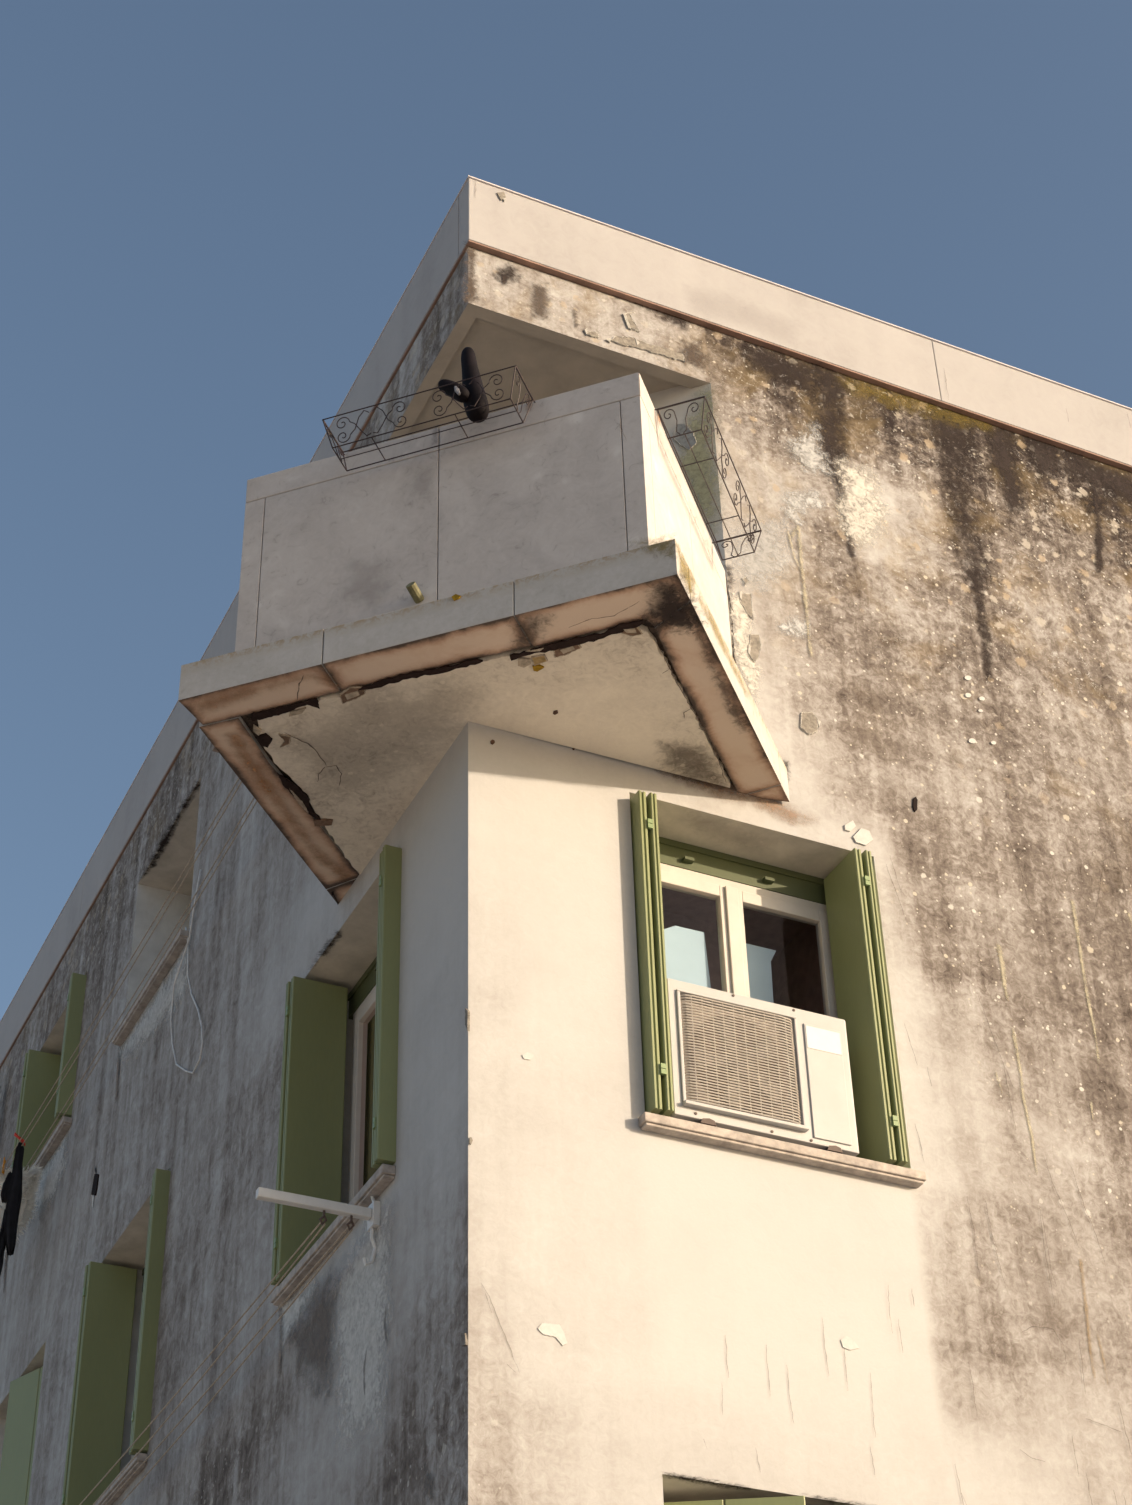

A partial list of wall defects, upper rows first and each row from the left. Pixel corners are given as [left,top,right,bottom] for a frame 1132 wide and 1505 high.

damp [495,266,548,317]
damp [737,344,855,559]
damp [925,406,1132,675]
flaking render [251,697,320,748]
crack [286,675,342,785]
flaking render [339,659,483,704]
flaking render [510,619,643,668]
damp [642,576,748,730]
flaking render [277,772,333,826]
damp [278,1276,336,1381]